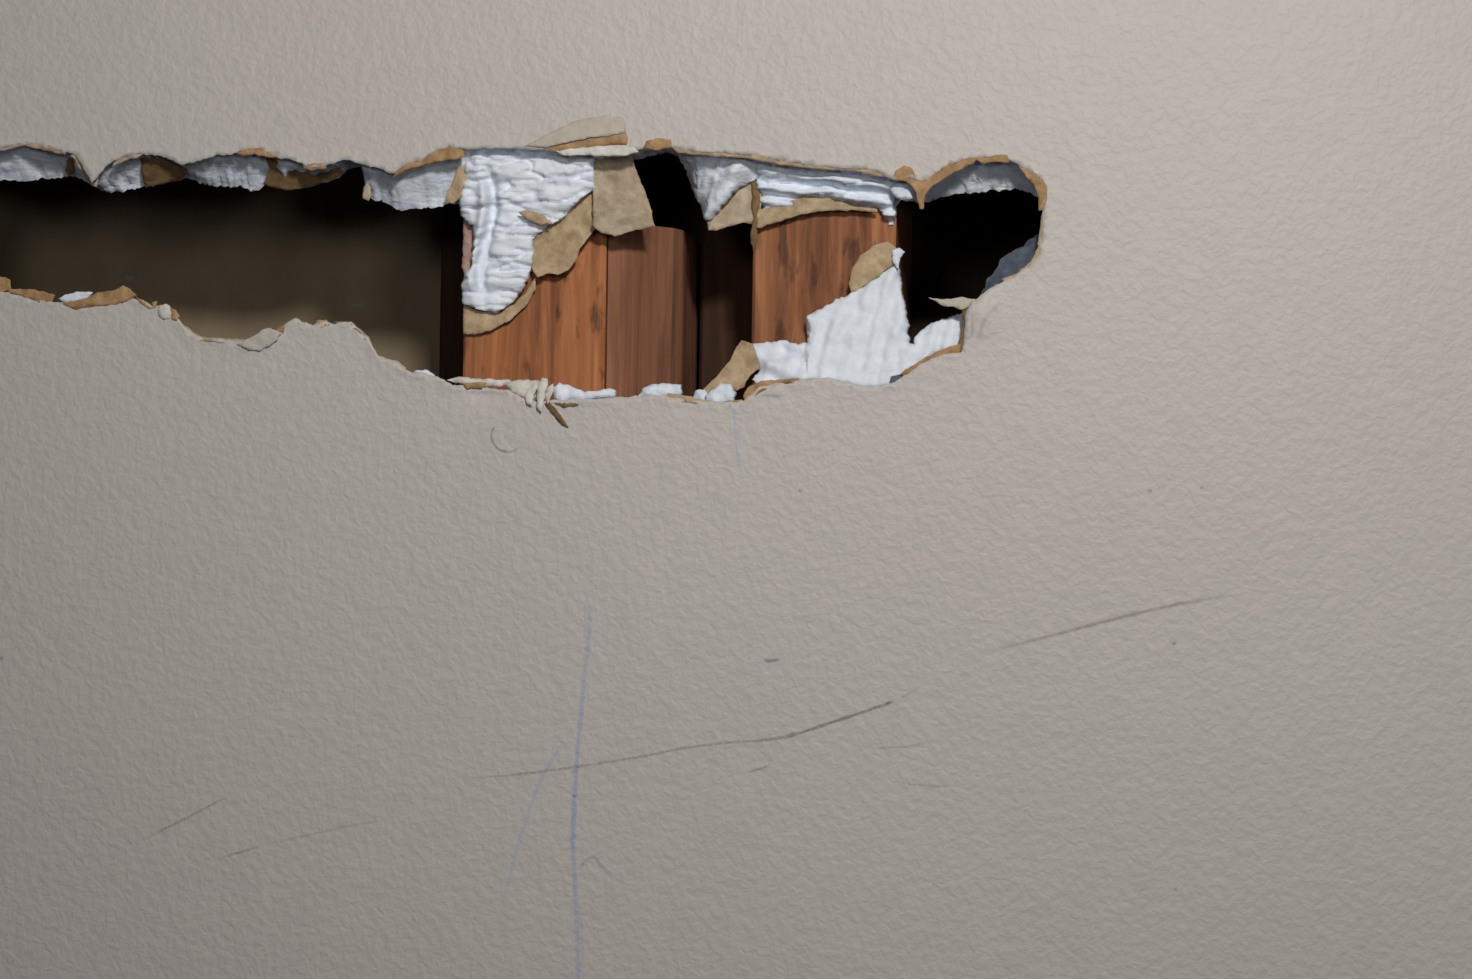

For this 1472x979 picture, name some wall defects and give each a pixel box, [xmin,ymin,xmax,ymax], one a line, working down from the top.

spalling [314,320,617,427]
spalling [0,115,1047,404]